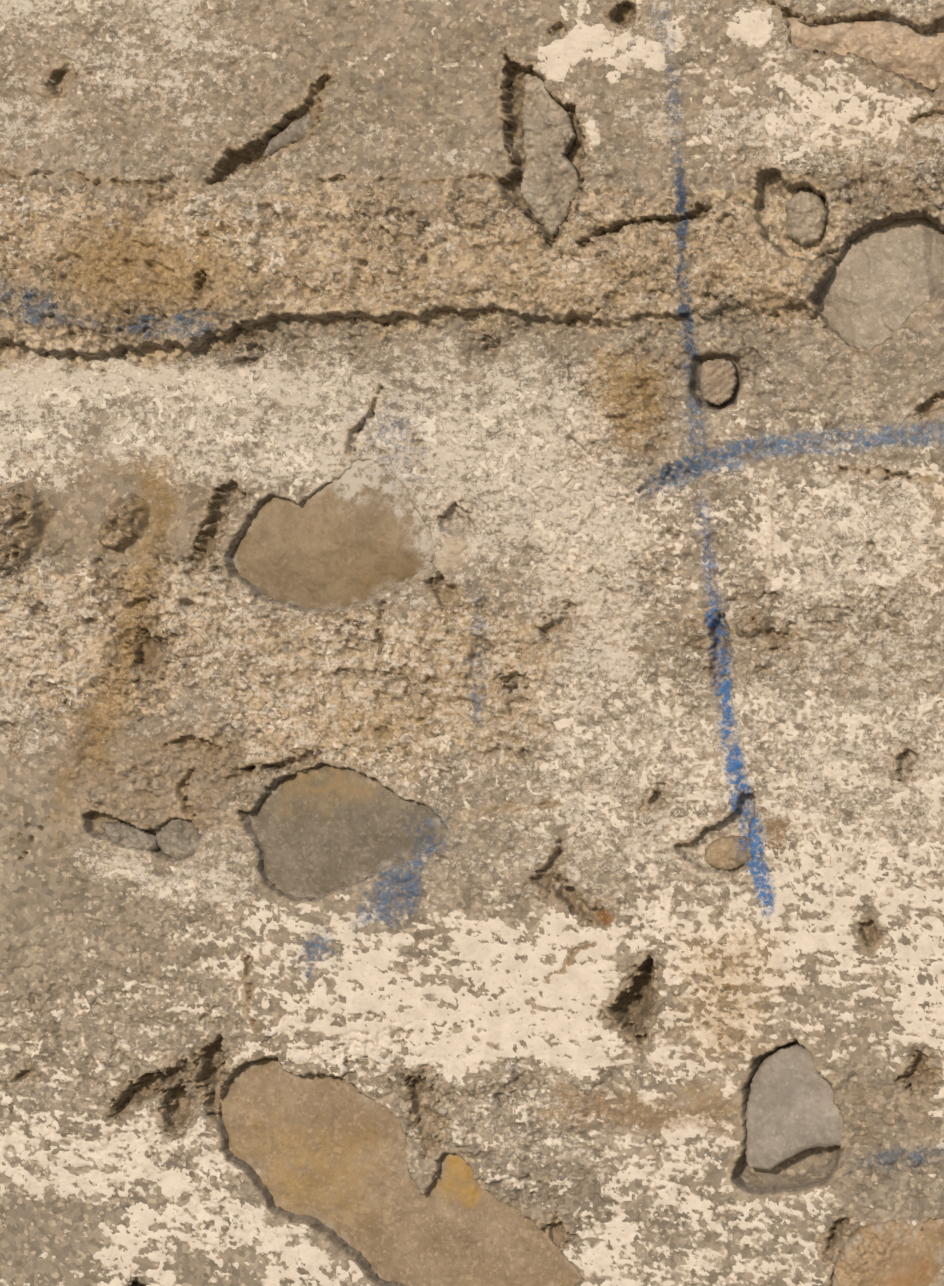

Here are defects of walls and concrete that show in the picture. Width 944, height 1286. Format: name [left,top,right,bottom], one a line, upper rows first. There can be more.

crack [752,0,781,12]
crack [342,382,428,474]